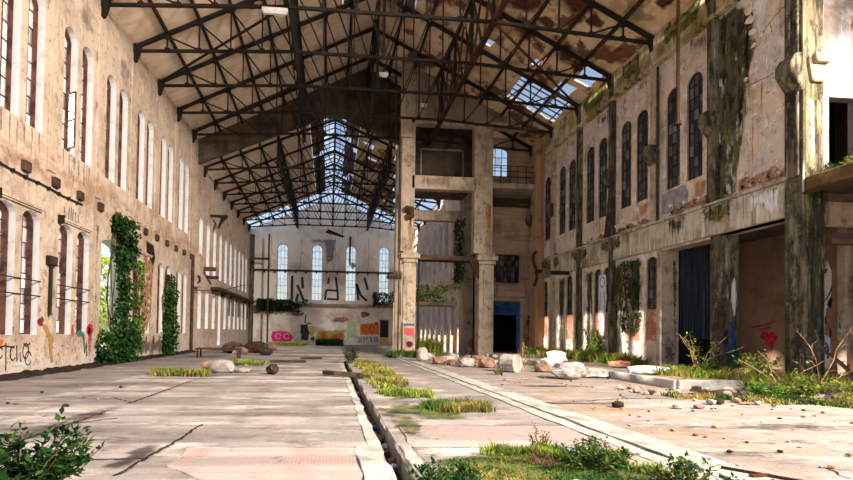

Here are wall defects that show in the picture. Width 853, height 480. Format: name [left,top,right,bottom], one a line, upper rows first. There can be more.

water stain [719,18,751,172]
water stain [810,96,826,154]
spalling [668,194,707,214]
water stain [740,186,780,213]
spalling [737,157,785,190]
crack [92,424,203,476]